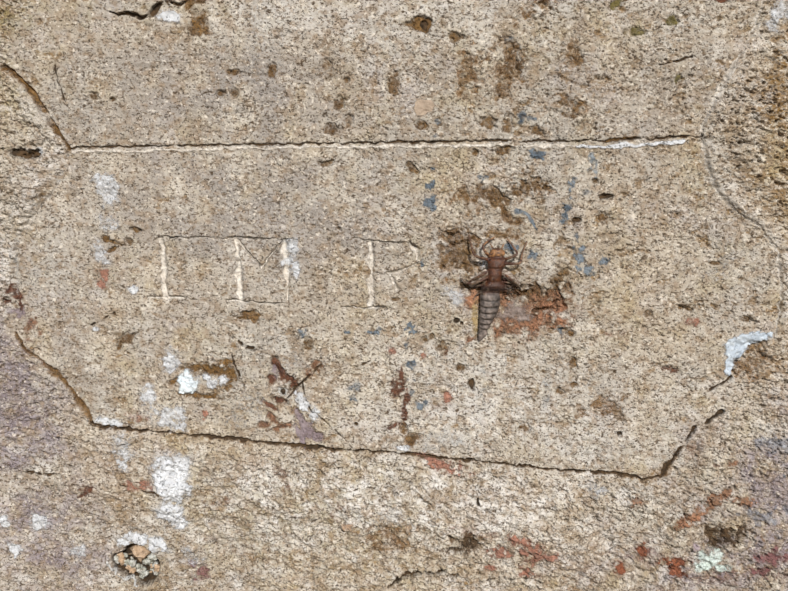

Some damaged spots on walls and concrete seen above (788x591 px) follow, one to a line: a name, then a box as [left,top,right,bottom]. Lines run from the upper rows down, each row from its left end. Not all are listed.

crack [110,0,189,20]
crack [232,336,254,376]
crack [287,364,353,448]
crack [686,409,724,439]
spalling [114,543,161,583]